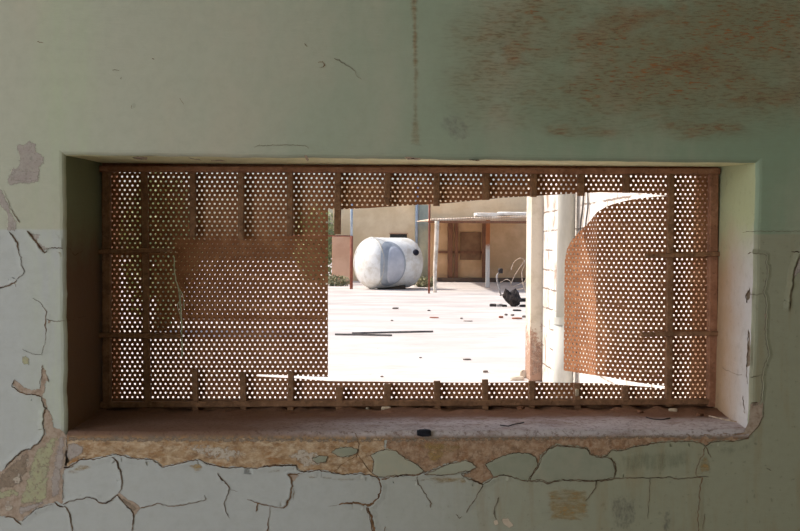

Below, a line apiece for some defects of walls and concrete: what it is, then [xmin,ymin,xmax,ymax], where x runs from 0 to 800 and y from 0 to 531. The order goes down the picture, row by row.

peeling [0,142,63,258]
crack [0,232,24,288]
crack [24,294,60,356]
crack [723,231,799,413]
crack [62,457,123,531]
crack [140,468,304,531]
crack [335,433,394,531]
peeling [0,365,764,530]
crack [529,447,711,531]